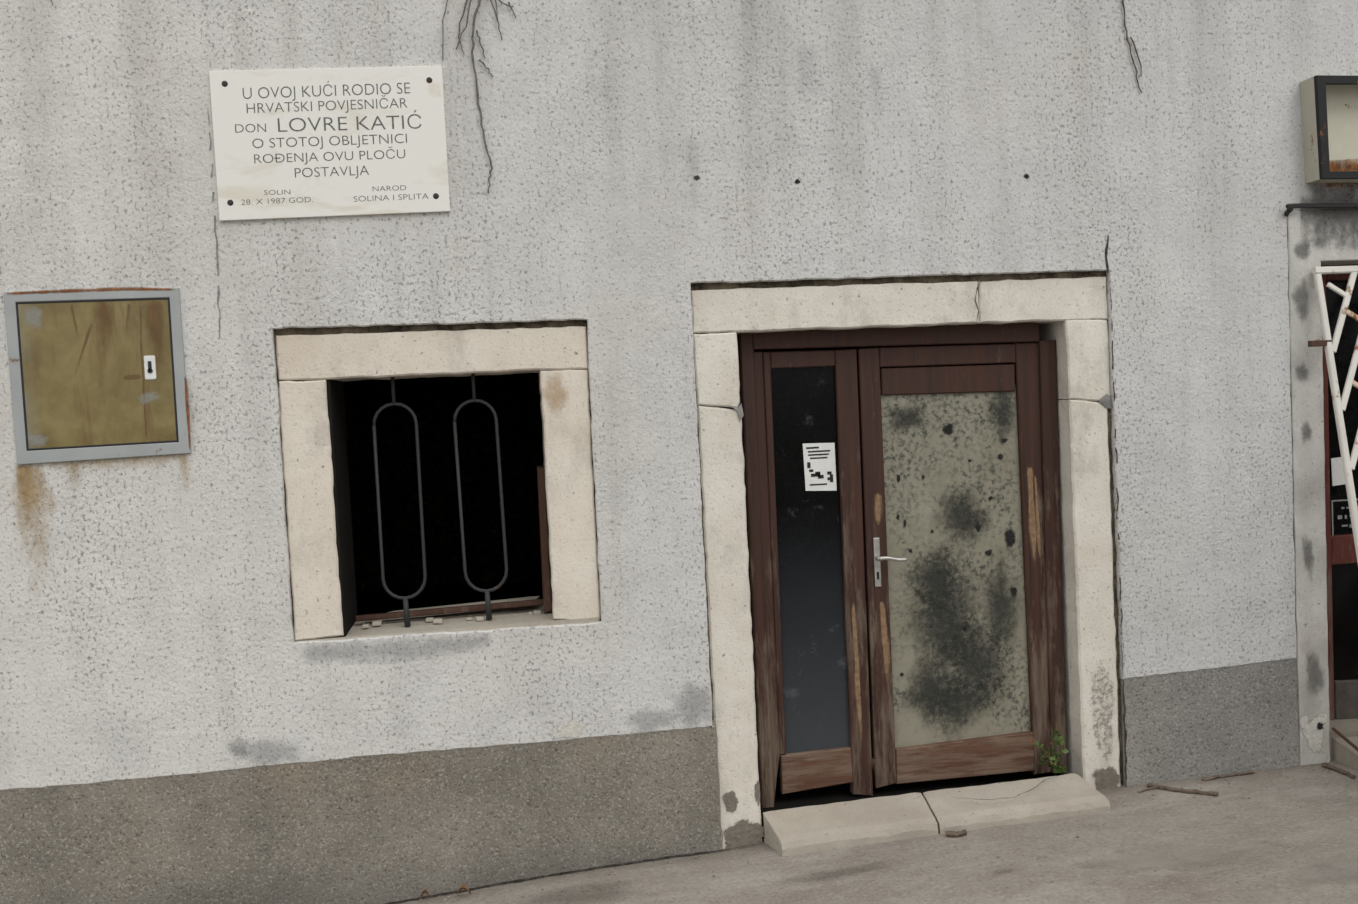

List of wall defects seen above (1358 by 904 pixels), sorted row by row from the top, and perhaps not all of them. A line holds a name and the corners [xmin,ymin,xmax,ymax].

rust [18,466,40,520]